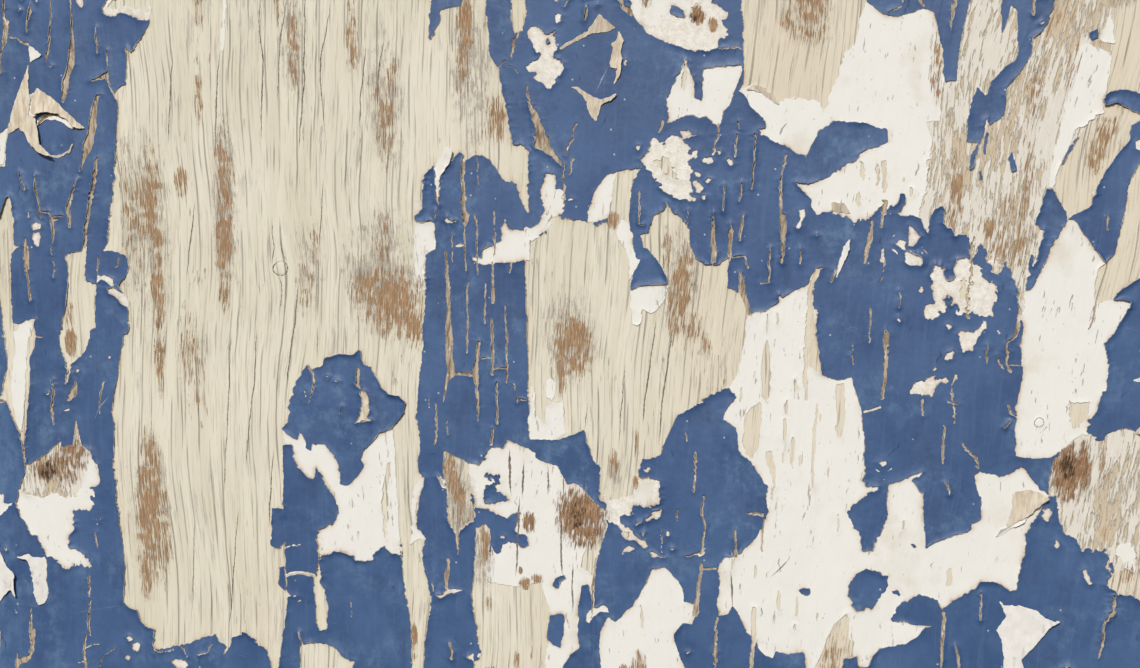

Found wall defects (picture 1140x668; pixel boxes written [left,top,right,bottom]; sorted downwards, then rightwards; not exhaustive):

peeling [0,46,84,166]
peeling [0,197,100,605]
peeling [59,0,529,668]
peeling [438,0,1140,668]